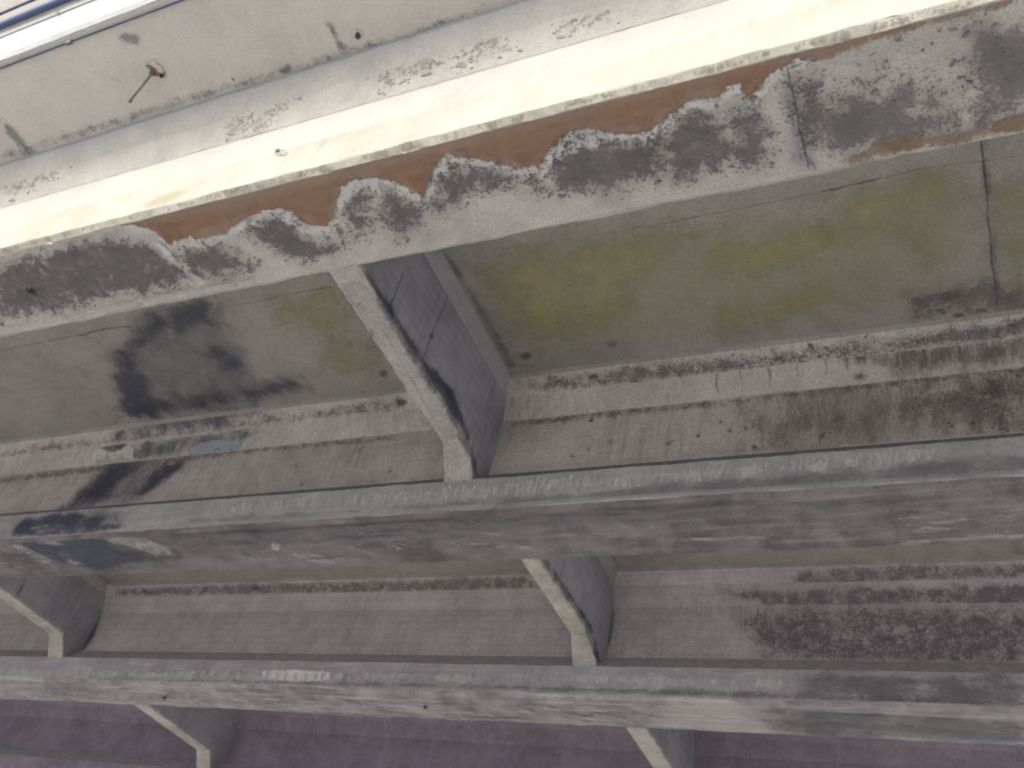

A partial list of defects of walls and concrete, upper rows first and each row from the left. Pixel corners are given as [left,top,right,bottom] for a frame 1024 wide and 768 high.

peeling [225,96,302,141]
peeling [365,35,523,96]
damp [0,0,1024,326]
crack [786,63,880,193]
crack [980,142,998,308]
damp [0,302,407,456]
damp [12,451,1024,569]
damp [1,559,1024,722]
damp [771,713,1024,748]